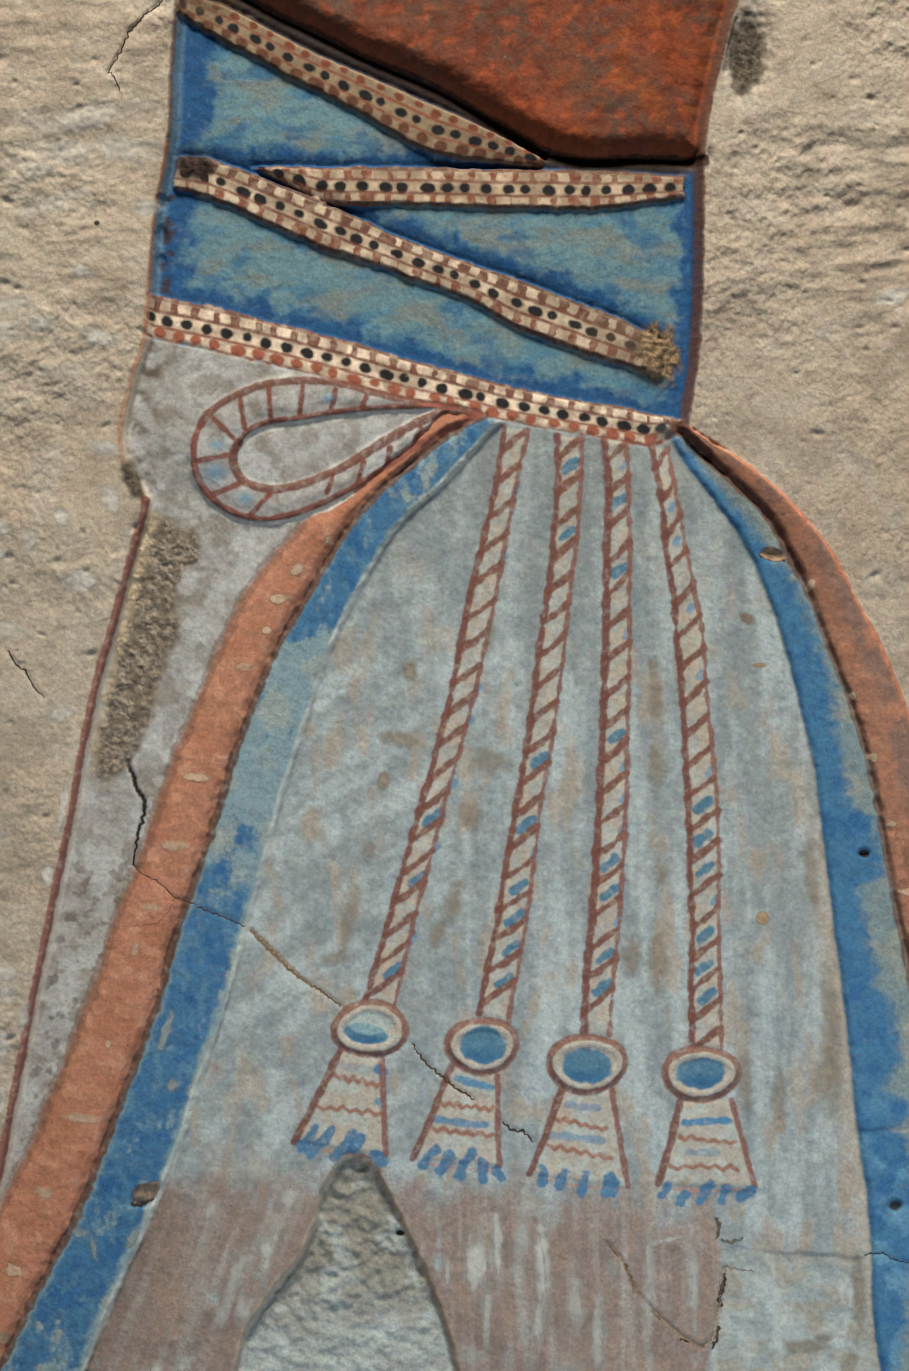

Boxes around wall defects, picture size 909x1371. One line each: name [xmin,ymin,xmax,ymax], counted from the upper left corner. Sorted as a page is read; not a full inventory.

crack [107,0,163,93]
spalling [638,321,680,382]
flaking render [92,515,198,778]
crack [125,762,341,1007]
crack [412,1043,475,1100]
crack [502,1122,533,1142]
crack [609,1217,743,1349]